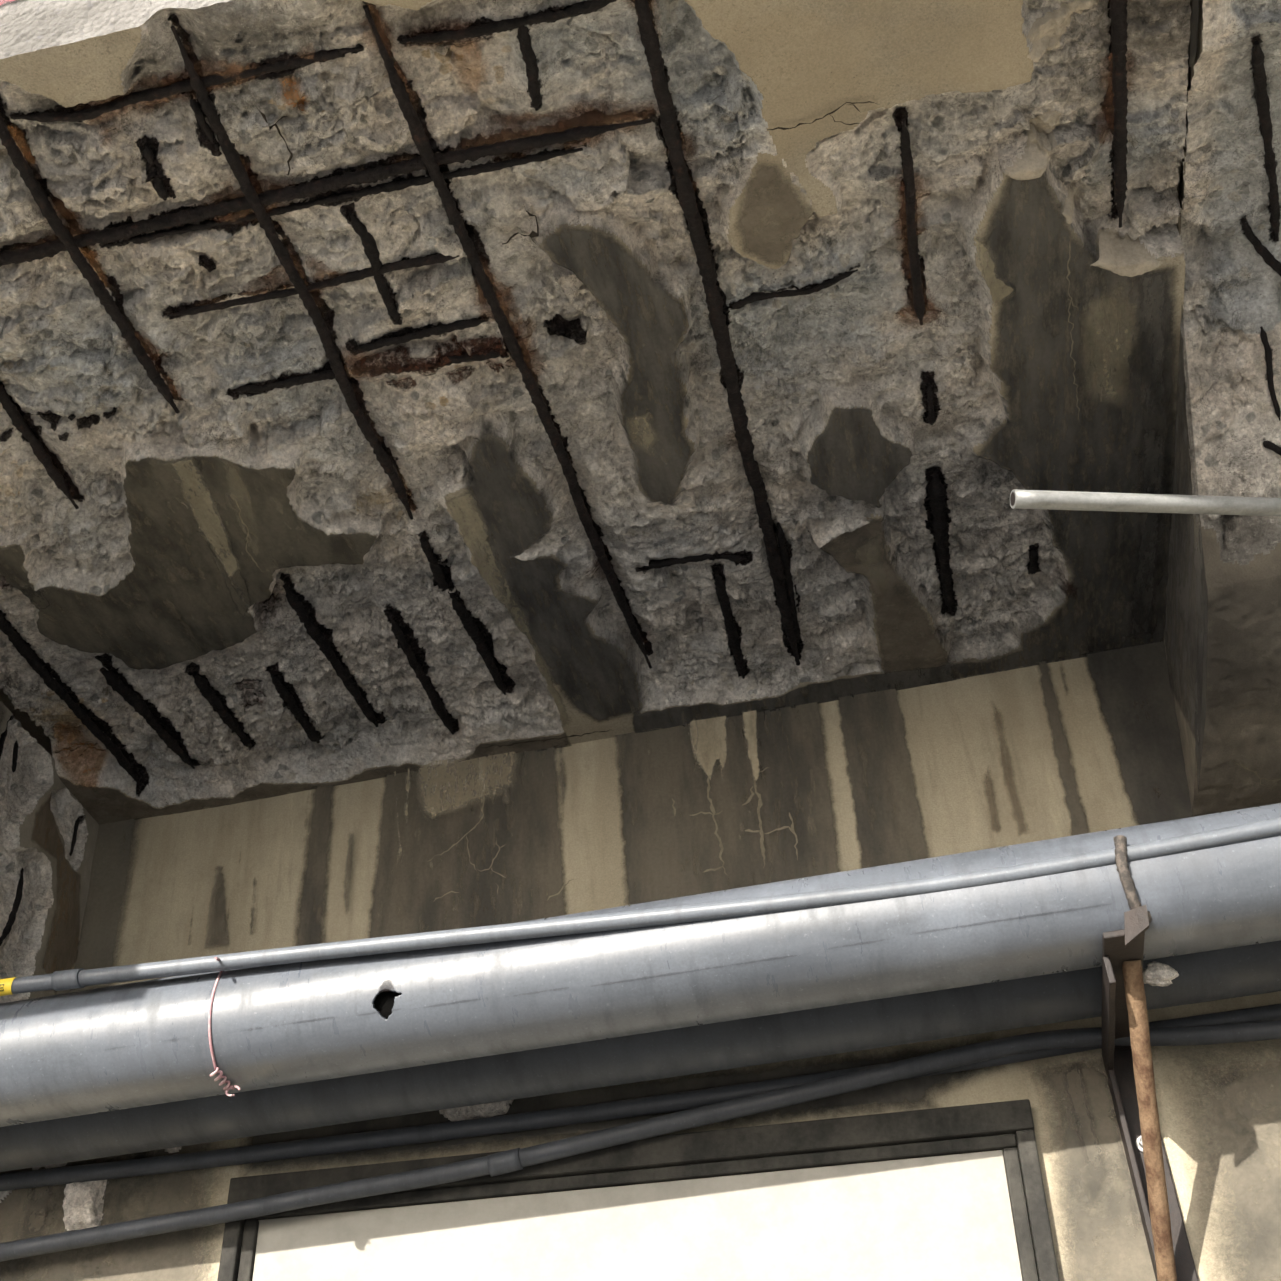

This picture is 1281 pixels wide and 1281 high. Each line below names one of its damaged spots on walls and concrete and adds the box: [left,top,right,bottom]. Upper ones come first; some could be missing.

crack [767,101,879,130]
rust [892,107,939,325]
rust [0,0,861,660]
water stain [542,222,692,505]
water stain [977,173,1198,495]
spalling [0,0,1281,1003]
rust [0,610,149,797]
rust [185,662,325,750]
rust [384,604,459,735]
rust [418,530,516,694]
water stain [0,407,1208,994]
crack [672,767,798,876]